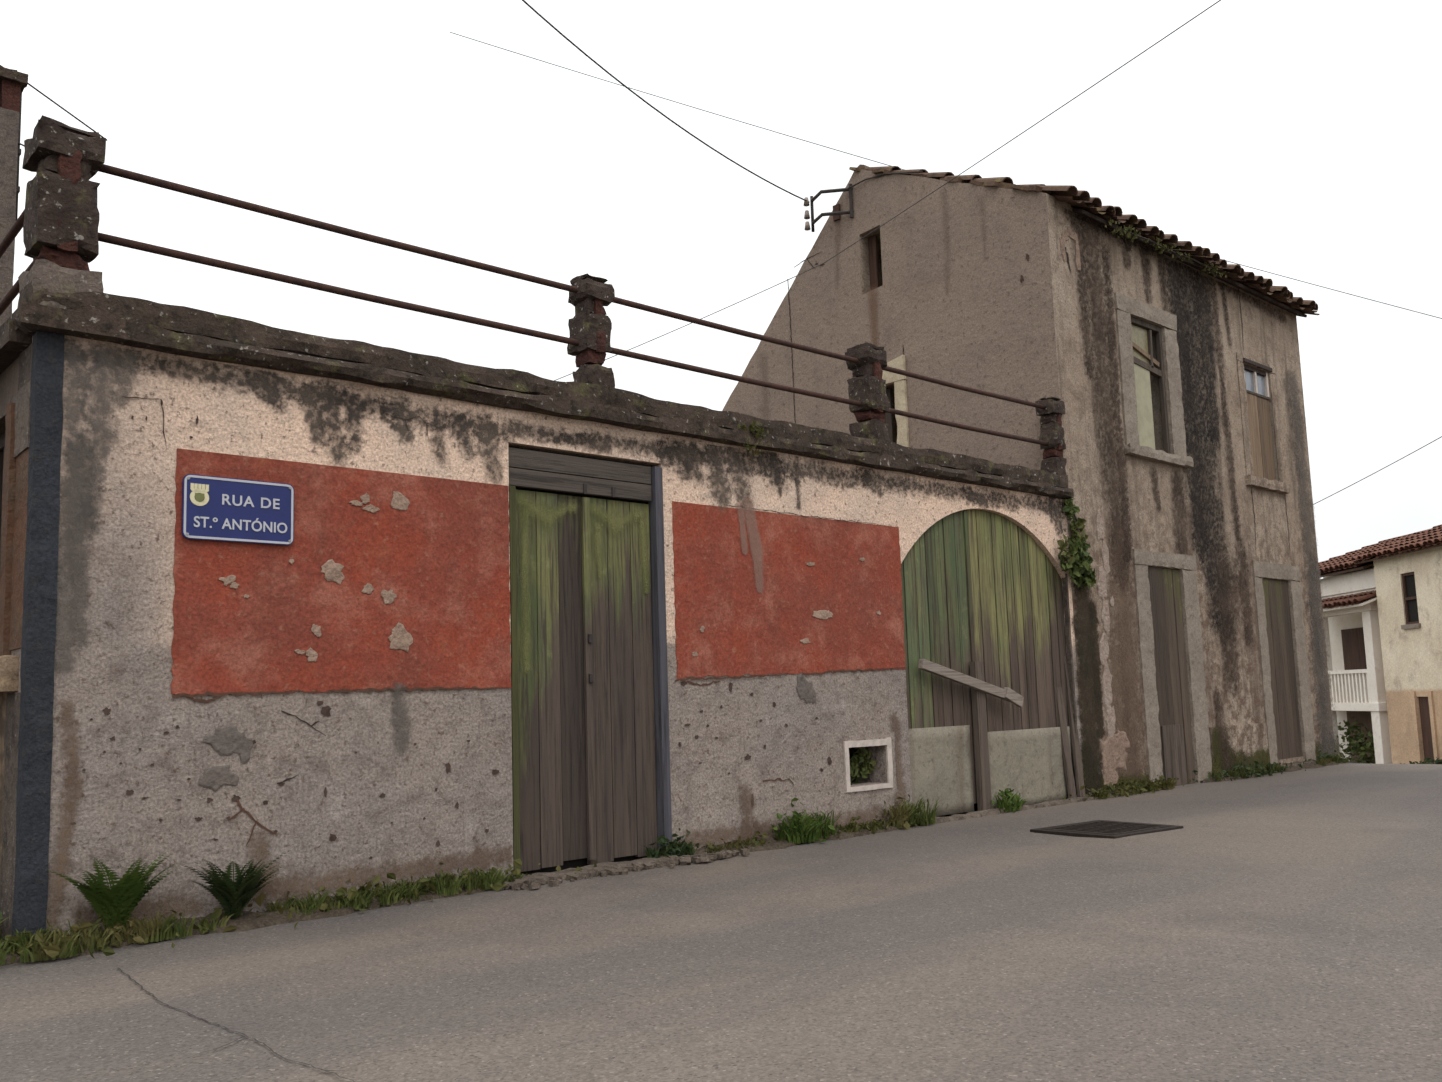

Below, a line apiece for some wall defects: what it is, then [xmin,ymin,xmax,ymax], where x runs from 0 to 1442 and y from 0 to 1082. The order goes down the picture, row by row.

peeling [349,491,410,513]
leakage [54,207,1286,793]
peeling [219,575,249,598]
peeling [321,559,345,584]
peeling [361,583,397,604]
leakage [1287,372,1337,757]
peeling [812,610,833,619]
peeling [294,624,321,662]
peeling [388,622,413,653]
crack [118,968,355,1082]